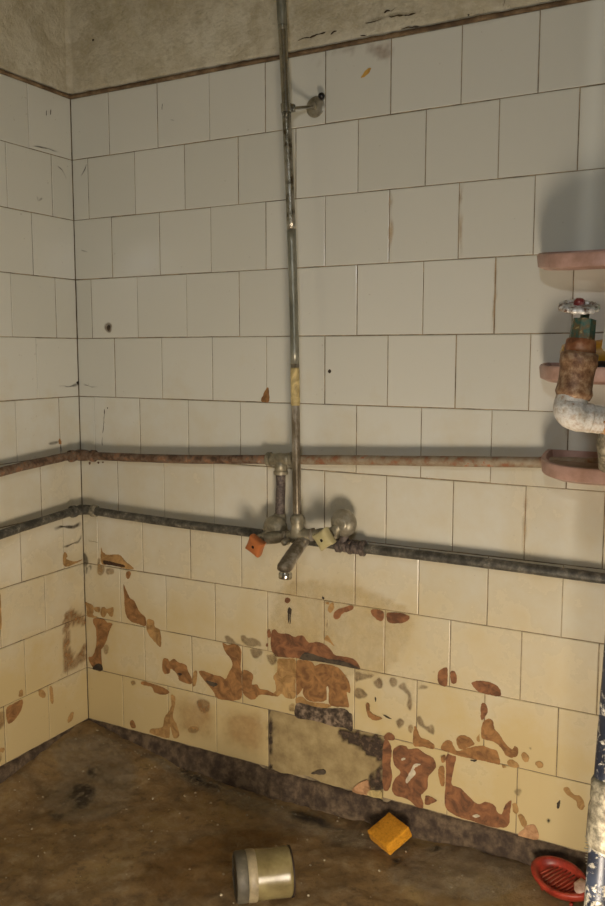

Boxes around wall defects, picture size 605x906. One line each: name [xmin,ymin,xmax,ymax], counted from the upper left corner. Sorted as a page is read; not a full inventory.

peeling [85,602,114,671]
peeling [97,548,161,647]
peeling [322,596,354,619]
peeling [371,609,410,624]
peeling [0,690,23,727]
peeling [131,681,199,738]
peeling [162,629,543,840]